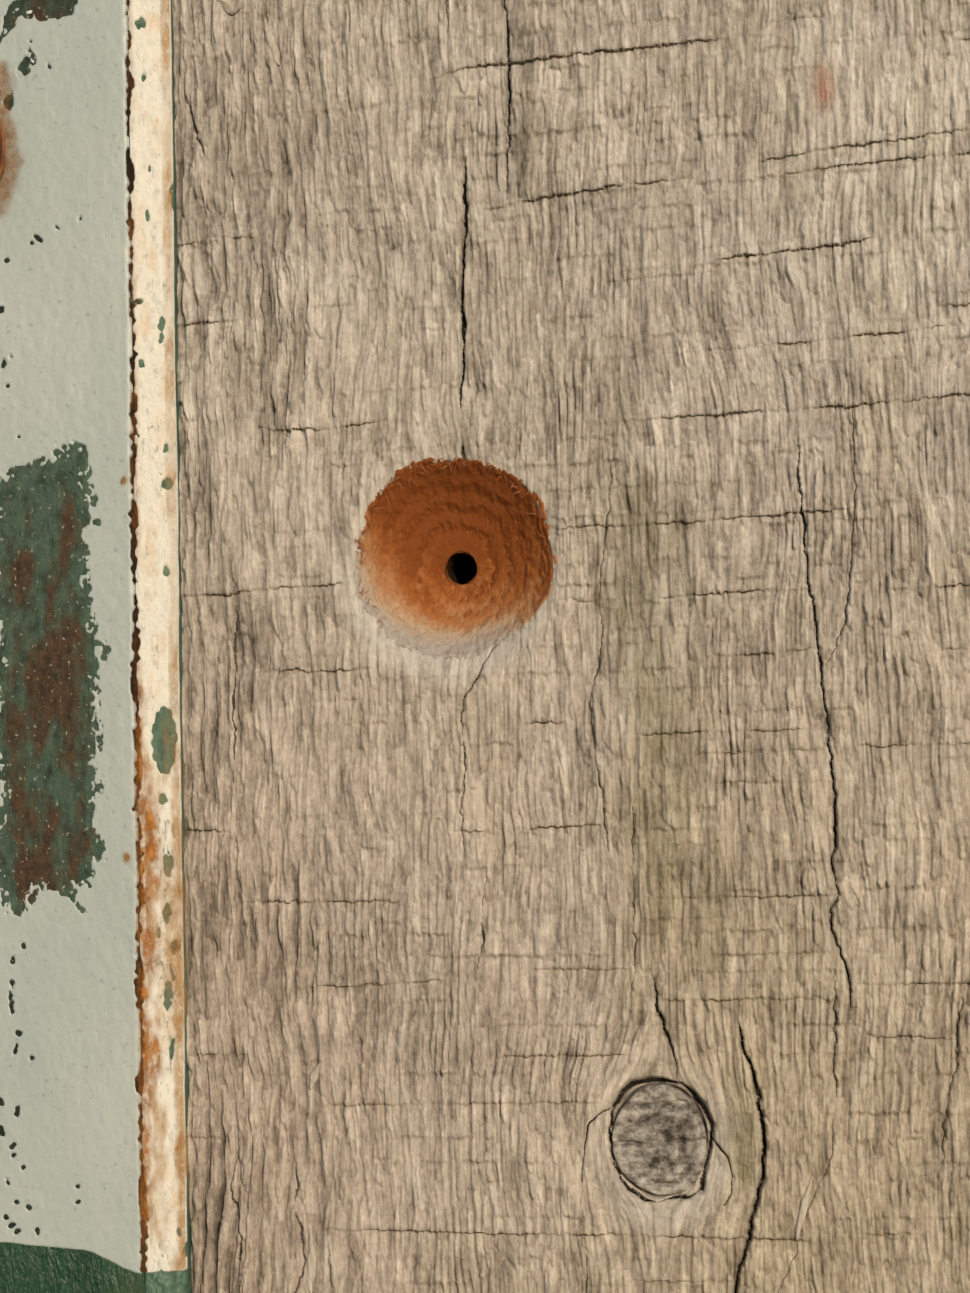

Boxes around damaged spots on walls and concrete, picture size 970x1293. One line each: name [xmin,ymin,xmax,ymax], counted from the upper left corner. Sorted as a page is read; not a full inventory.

peeling [3,92,14,111]
peeling [18,40,51,78]
peeling [0,0,78,43]
crack [459,156,469,410]
peeling [0,442,111,917]
corrosion [121,0,190,1273]
crack [581,454,767,1293]
crack [778,403,857,1293]